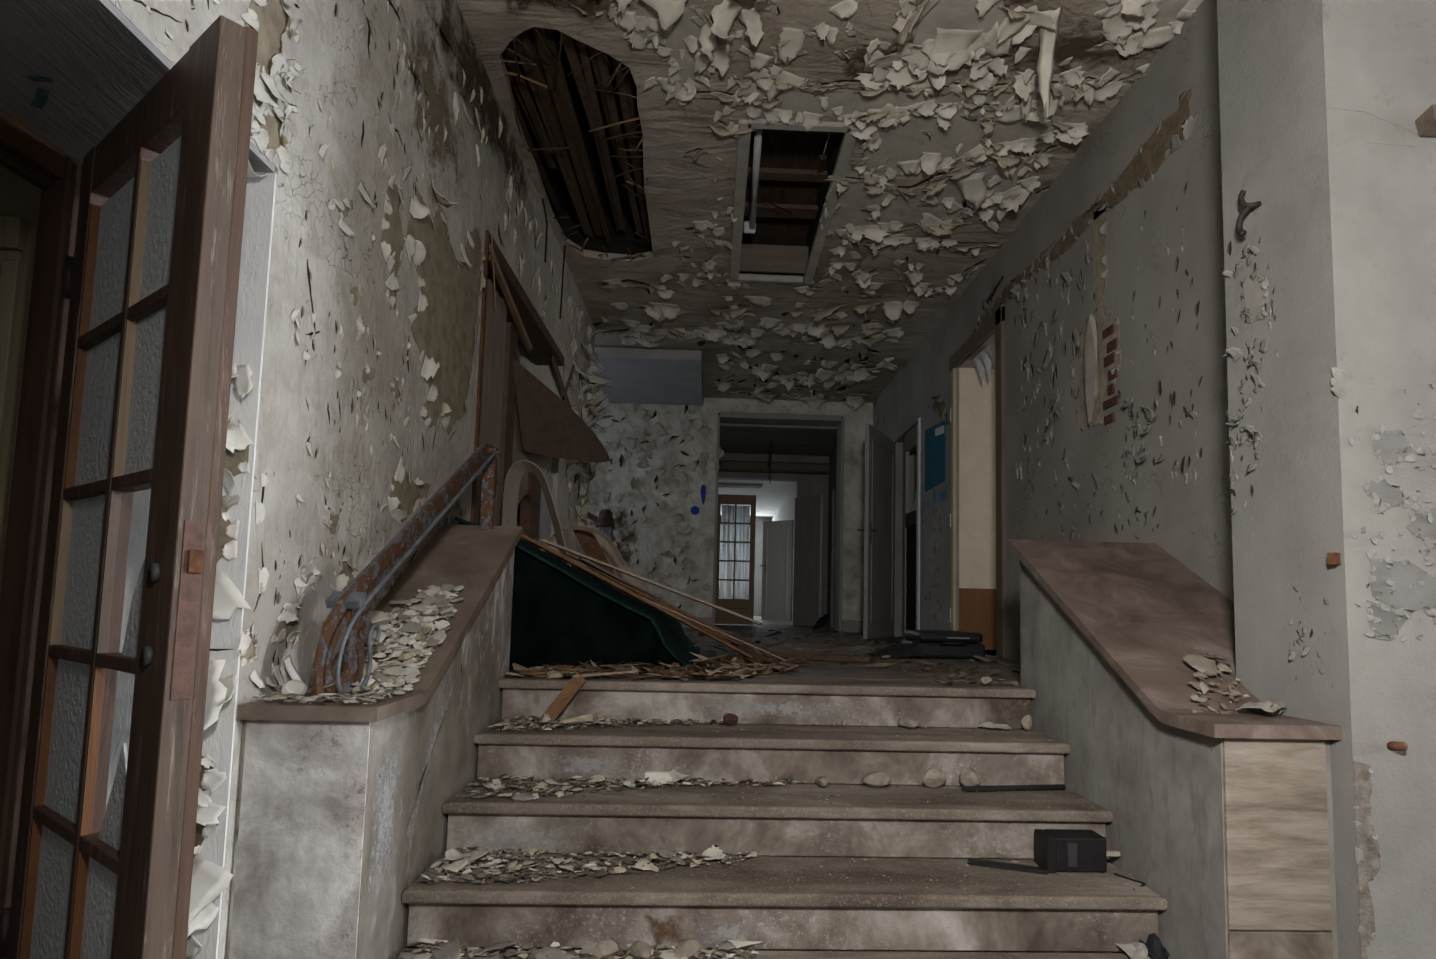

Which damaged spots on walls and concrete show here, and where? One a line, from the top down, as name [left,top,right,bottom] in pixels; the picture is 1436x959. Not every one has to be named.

peeling [204,0,503,730]
peeling [504,0,1203,547]
spalling [1331,367,1359,414]
peeling [1351,389,1436,642]
peeling [186,753,233,959]